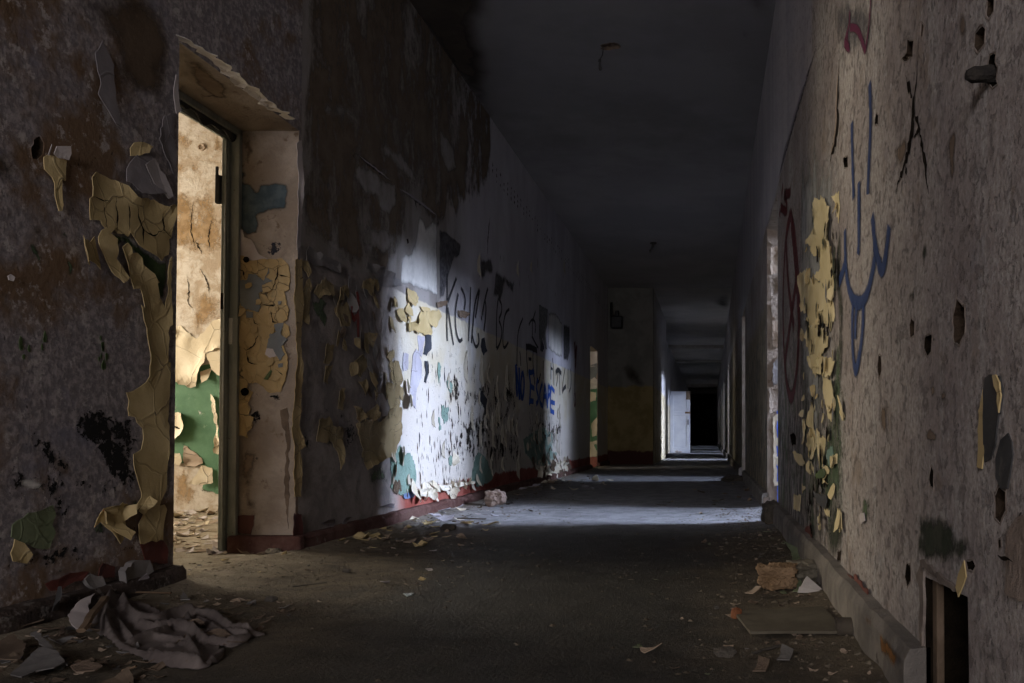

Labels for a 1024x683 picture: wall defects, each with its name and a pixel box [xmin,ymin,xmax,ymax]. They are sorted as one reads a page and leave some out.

peeling [30,135,72,211]
spalling [176,35,295,120]
crack [830,66,839,166]
crack [896,61,929,194]
spalling [974,0,998,90]
peeling [45,74,220,591]
peeling [238,140,572,537]
peeling [766,191,845,540]
damp [0,409,138,516]
peeling [977,375,1014,551]
peeling [10,539,33,564]